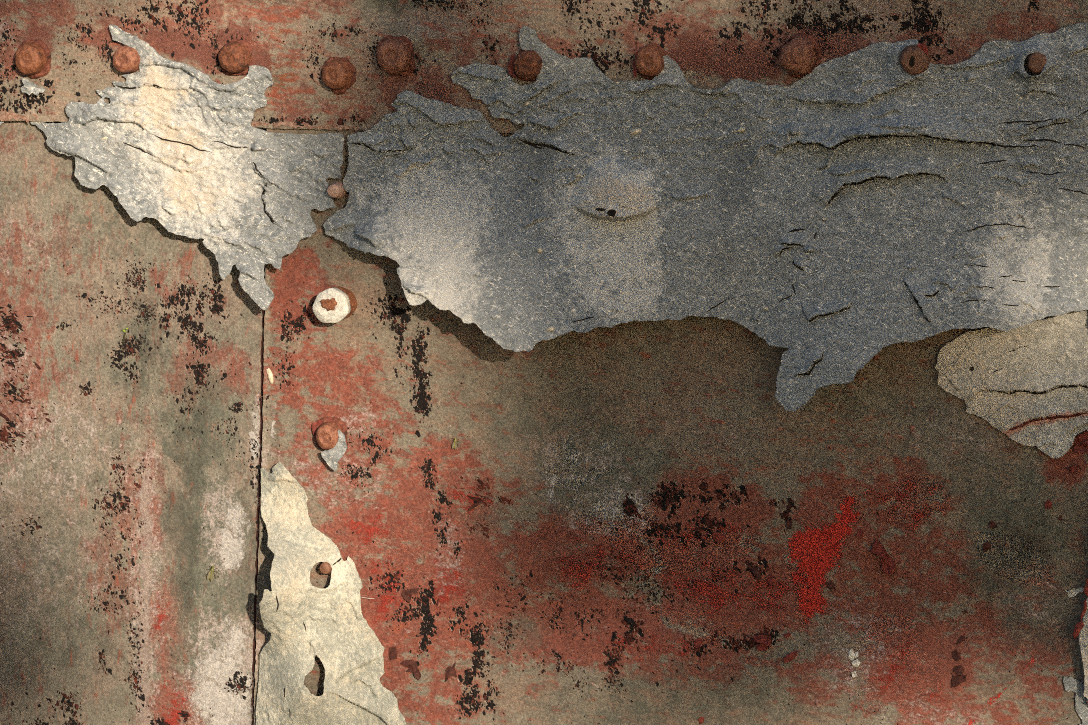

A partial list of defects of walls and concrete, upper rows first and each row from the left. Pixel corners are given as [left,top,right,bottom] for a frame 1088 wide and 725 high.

rust [0,0,259,114]
rust [707,0,956,66]
peeling [0,23,1088,473]
rust [0,304,56,452]
rust [76,255,337,505]
rust [362,283,433,438]
rust [79,450,191,725]
peeling [256,461,421,725]
peeling [445,662,457,682]
rust [365,452,790,721]
peeling [952,635,967,688]
peeling [1063,579,1088,725]